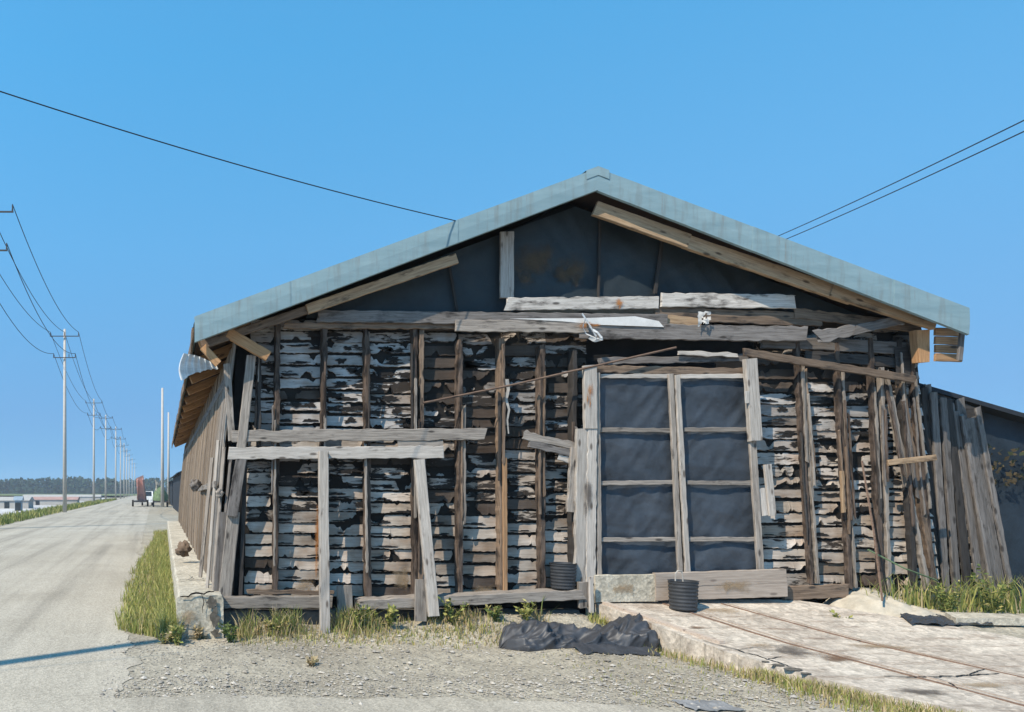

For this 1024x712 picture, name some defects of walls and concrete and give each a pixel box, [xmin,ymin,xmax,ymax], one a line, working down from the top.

peeling [280,332,411,431]
peeling [292,469,411,583]
peeling [426,407,455,427]
peeling [464,359,491,368]
peeling [760,395,797,450]
peeling [812,421,839,510]
peeling [847,395,875,572]